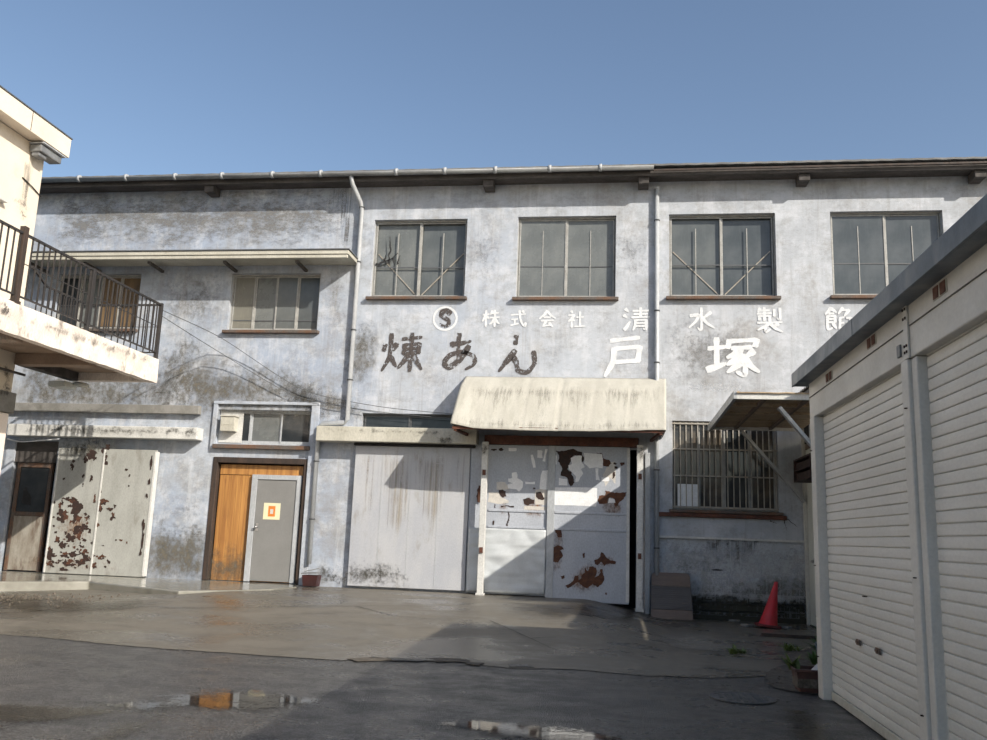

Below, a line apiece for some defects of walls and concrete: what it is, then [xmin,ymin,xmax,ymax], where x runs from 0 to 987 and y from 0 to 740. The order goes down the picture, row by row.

leakage [28,345,353,412]
corrosion [63,444,110,487]
peeling [488,449,616,510]
corrosion [556,449,584,486]
corrosion [597,453,625,479]
corrosion [598,490,627,513]
corrosion [44,491,116,571]
leakage [149,532,243,579]
leakage [322,565,397,582]
corrosion [553,530,564,562]
corrosion [561,552,616,595]